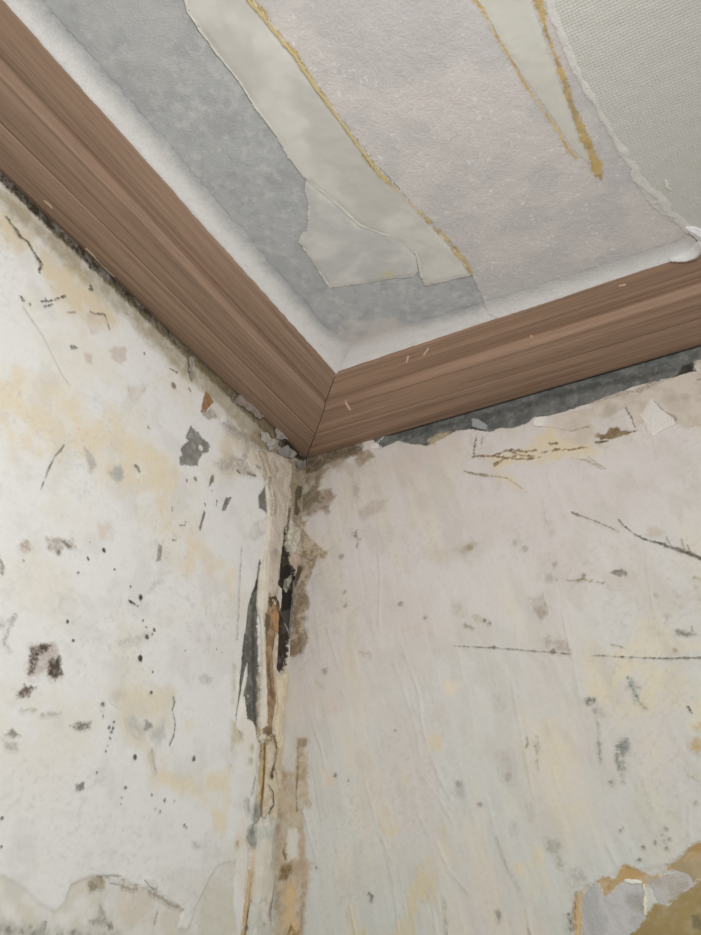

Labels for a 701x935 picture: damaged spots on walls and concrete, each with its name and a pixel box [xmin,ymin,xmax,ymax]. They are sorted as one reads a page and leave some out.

flaking render [200,391,223,421]
flaking render [369,345,701,470]
leakage [0,172,390,733]
flaking render [180,425,211,483]
crack [471,435,602,470]
flaking render [198,474,232,531]
flaking render [236,428,306,821]
crack [453,645,565,655]
crack [591,653,701,661]
leakage [15,639,167,776]
leakage [267,734,319,935]
leakage [0,898,125,935]